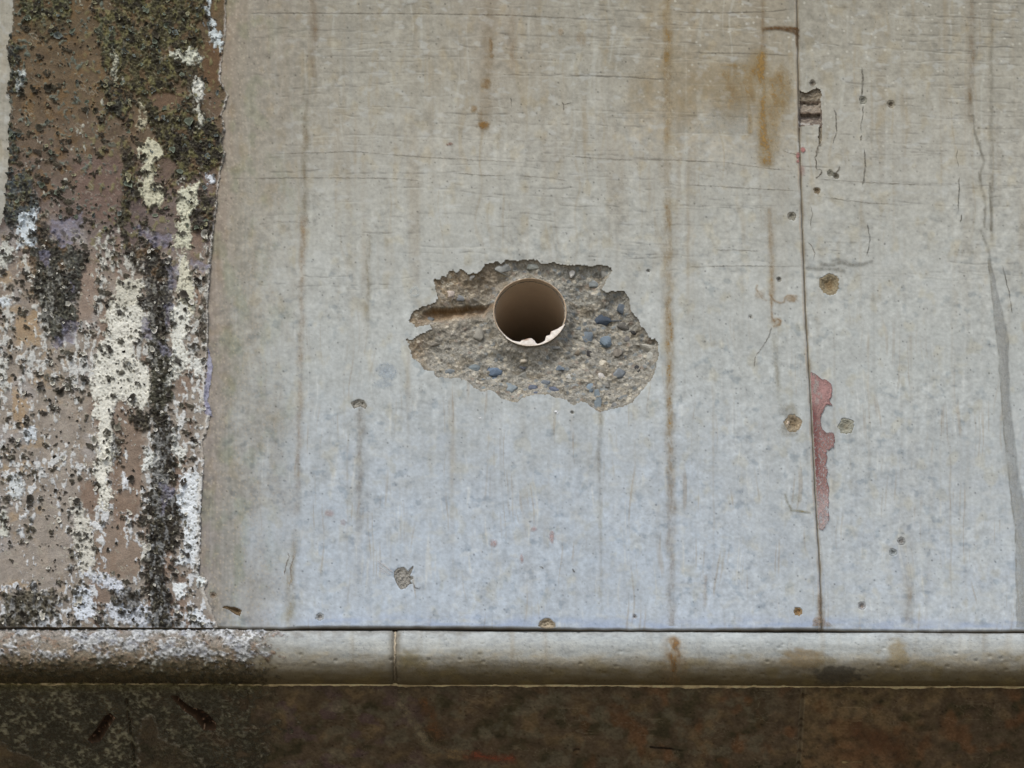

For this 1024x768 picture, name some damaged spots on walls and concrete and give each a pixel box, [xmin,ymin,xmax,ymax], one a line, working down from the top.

rust [722,52,788,165]
spalling [798,87,823,144]
spalling [406,259,659,412]
peeling [811,372,835,530]
peeling [394,567,414,589]